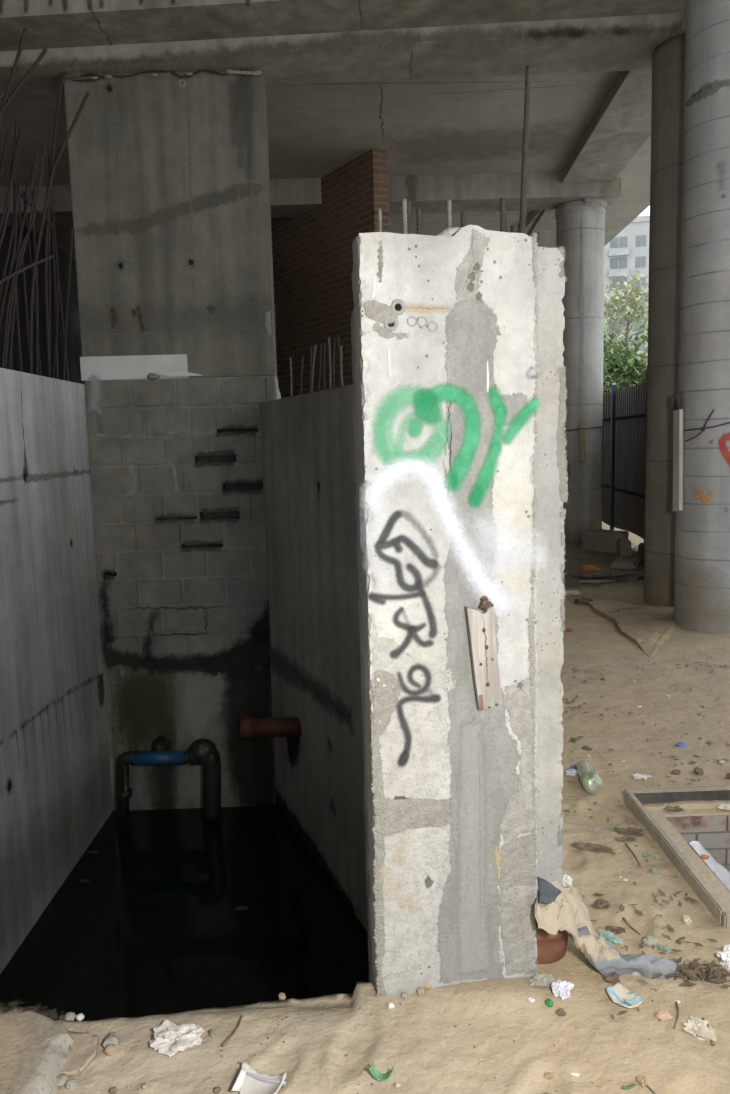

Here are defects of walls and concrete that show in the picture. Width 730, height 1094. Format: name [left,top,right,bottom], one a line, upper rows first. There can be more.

crack [349,81,595,145]
spalling [532,232,540,361]
damp [82,570,354,913]
peeling [371,263,539,997]